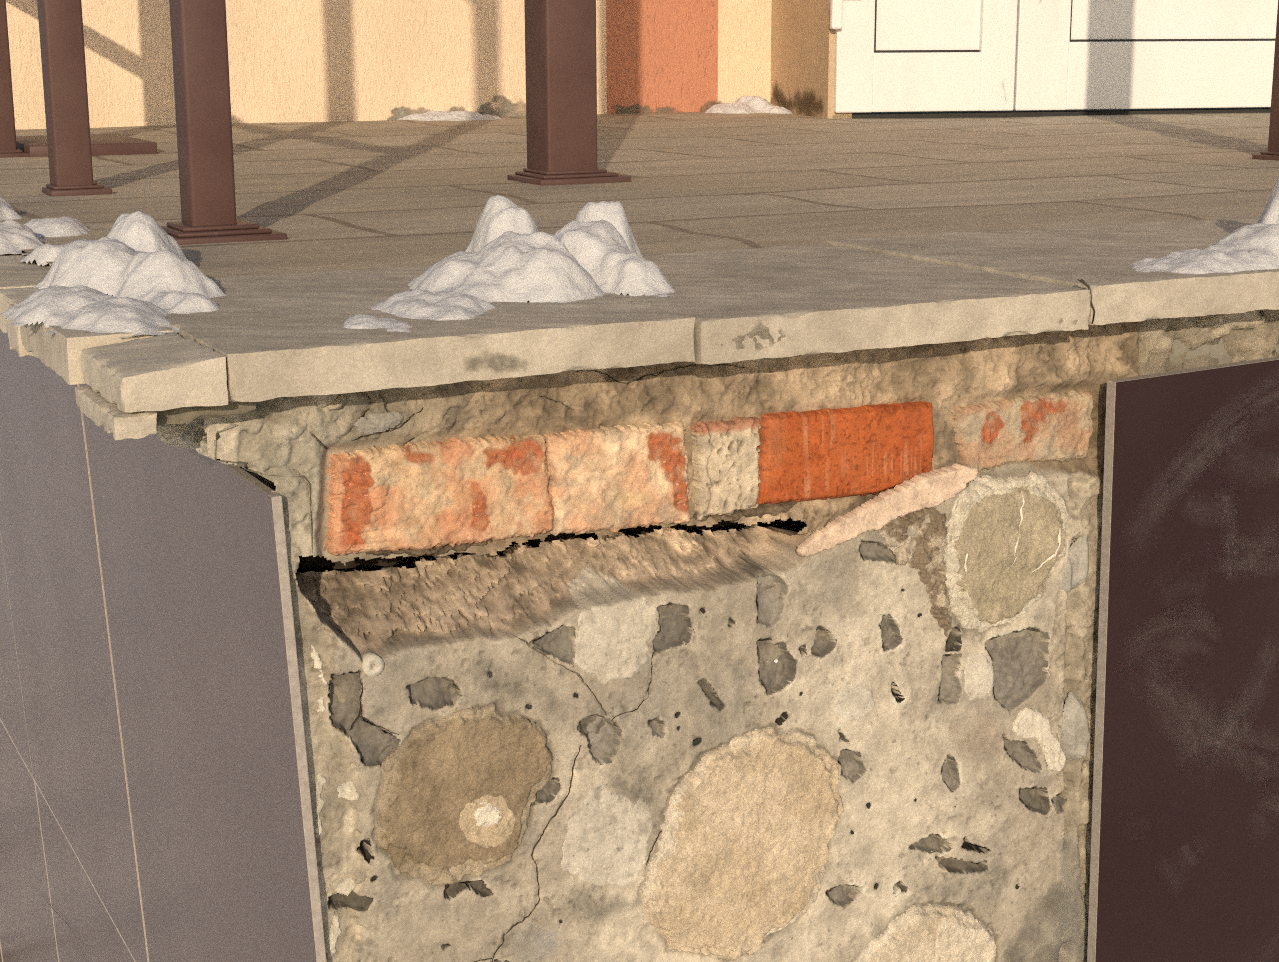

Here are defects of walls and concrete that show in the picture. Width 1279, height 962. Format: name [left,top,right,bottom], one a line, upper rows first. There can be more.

crack [1077,279,1095,324]
spalling [653,603,695,652]
spalling [734,553,837,695]
peeling [797,463,979,704]
spalling [328,671,400,767]
crack [515,636,655,720]
spalling [985,628,1050,711]
spalling [1003,735,1068,815]
spalling [327,890,373,911]
spalling [444,880,493,901]
crack [475,745,581,962]
spalling [909,834,991,874]